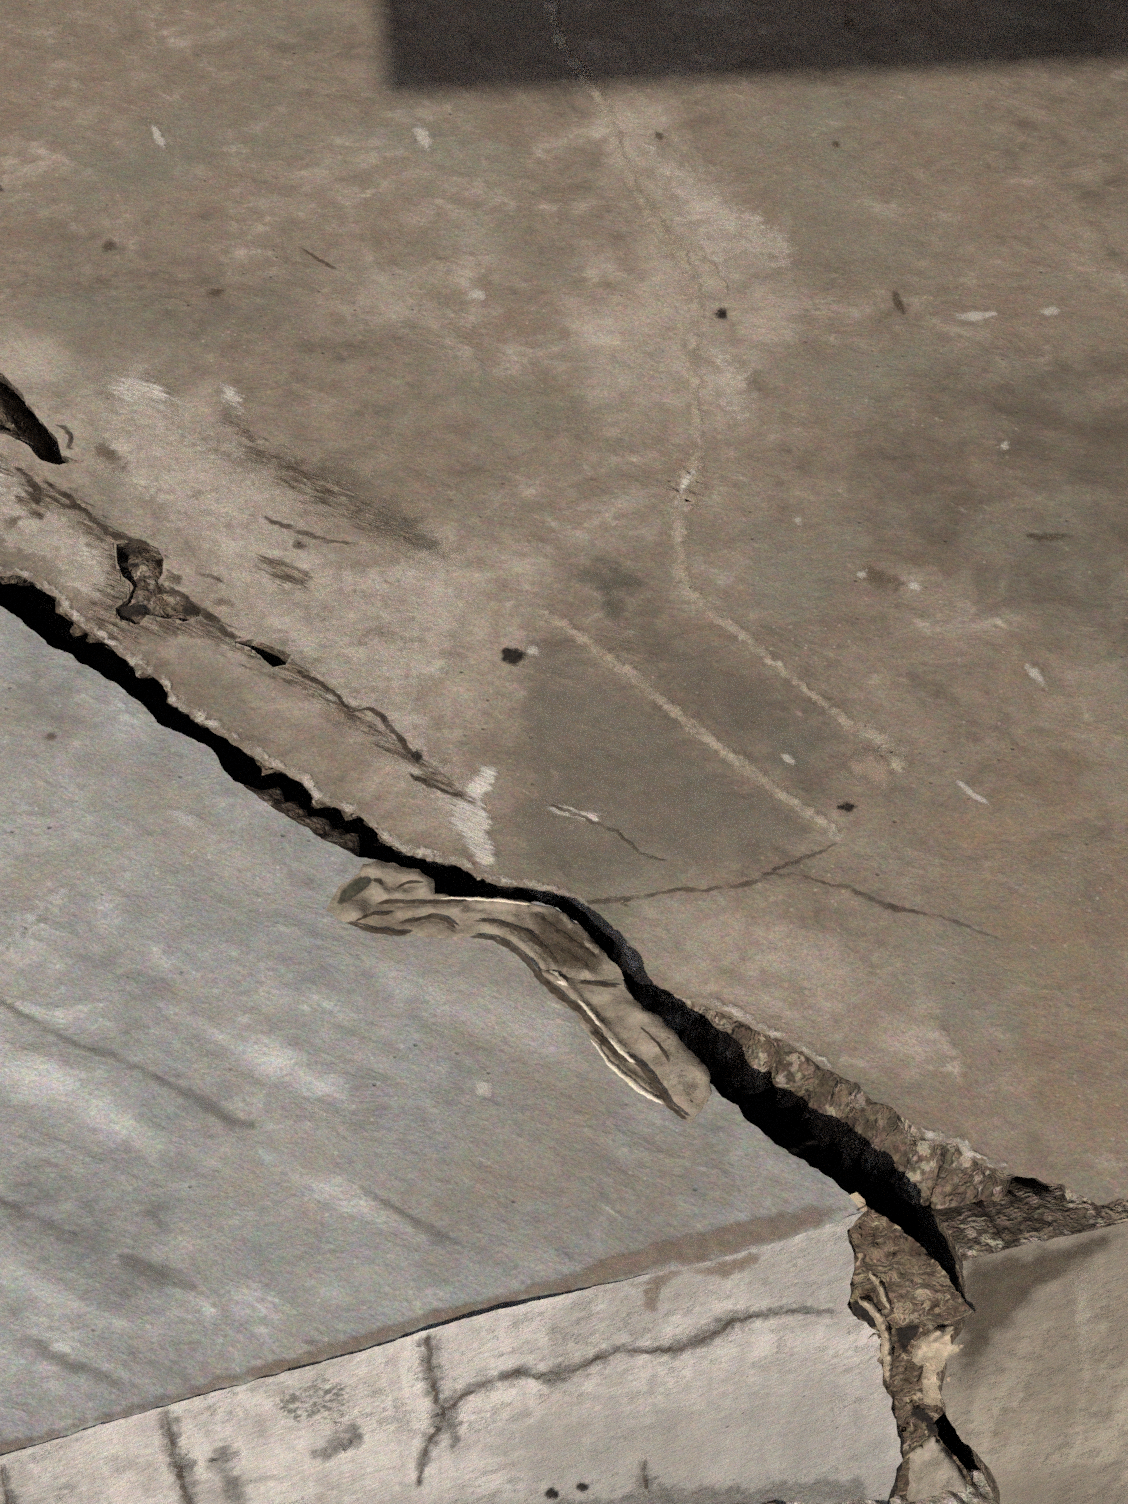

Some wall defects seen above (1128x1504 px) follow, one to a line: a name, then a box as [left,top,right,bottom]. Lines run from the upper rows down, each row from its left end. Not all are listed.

crack [0,372,148,547]
crack [264,516,348,548]
crack [0,575,1128,1244]
spalling [717,1002,787,1037]
spalling [847,1129,1128,1504]
crack [415,1307,834,1487]
crack [0,1467,17,1504]
crack [158,1414,196,1504]
crack [638,1462,673,1504]